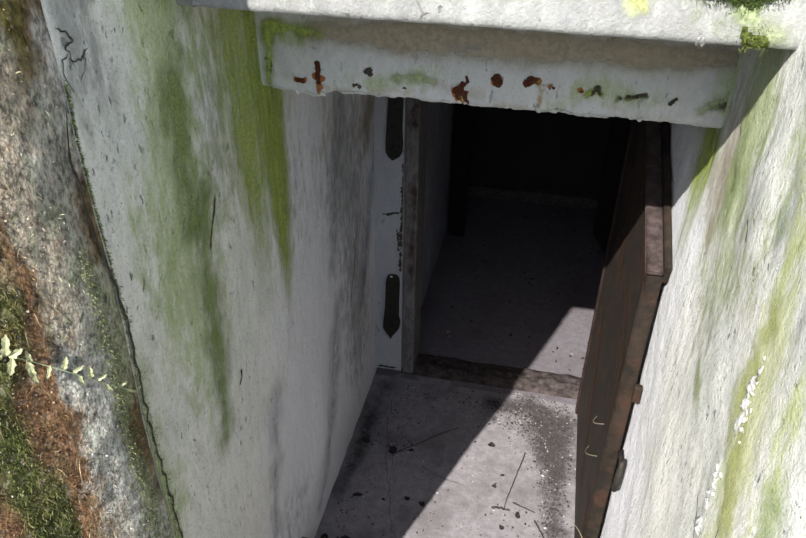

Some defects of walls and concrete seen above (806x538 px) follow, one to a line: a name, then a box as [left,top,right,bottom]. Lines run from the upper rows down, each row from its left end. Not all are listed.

rust [293,60,325,94]
rust [451,76,470,104]
rust [491,73,503,88]
rust [523,75,555,105]
damp [249,11,289,268]
crack [209,197,217,249]
crack [55,27,186,538]